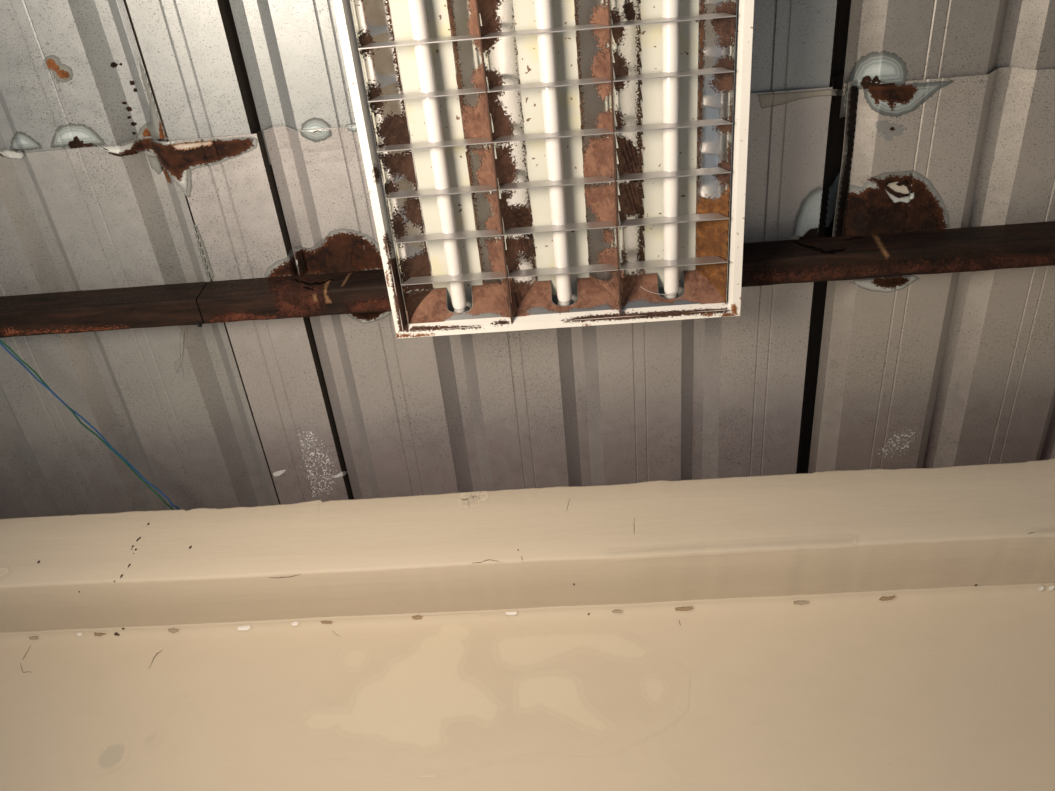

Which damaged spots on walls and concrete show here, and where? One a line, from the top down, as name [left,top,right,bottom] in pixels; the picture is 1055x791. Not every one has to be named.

corrosion [43,42,73,92]
corrosion [119,62,258,197]
corrosion [206,0,738,338]
corrosion [863,80,953,117]
corrosion [746,171,1055,293]
corrosion [0,324,130,337]
damp [282,613,690,772]